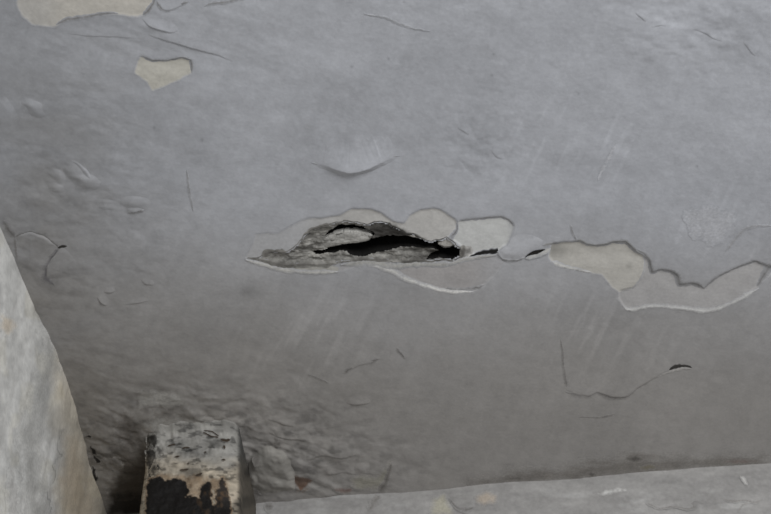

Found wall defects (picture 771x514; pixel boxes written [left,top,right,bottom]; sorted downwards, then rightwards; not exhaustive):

peeling [15,0,157,29]
peeling [133,54,194,92]
crack [1,220,80,286]
spalling [245,208,771,314]
water stain [3,326,223,514]